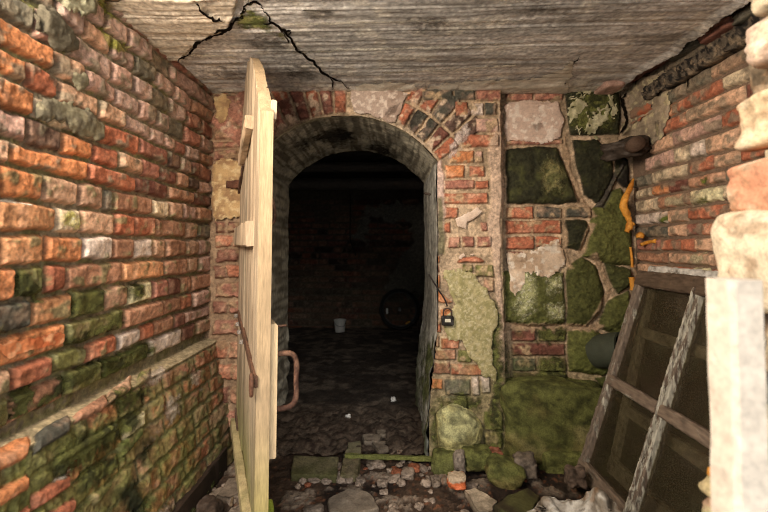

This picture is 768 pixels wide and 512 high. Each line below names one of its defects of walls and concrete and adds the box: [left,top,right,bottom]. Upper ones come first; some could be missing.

crack [178,0,351,90]
peeling [456,207,482,229]
peeling [506,239,566,296]
peeling [443,253,498,384]
leakage [164,396,179,424]
leakage [121,479,144,512]